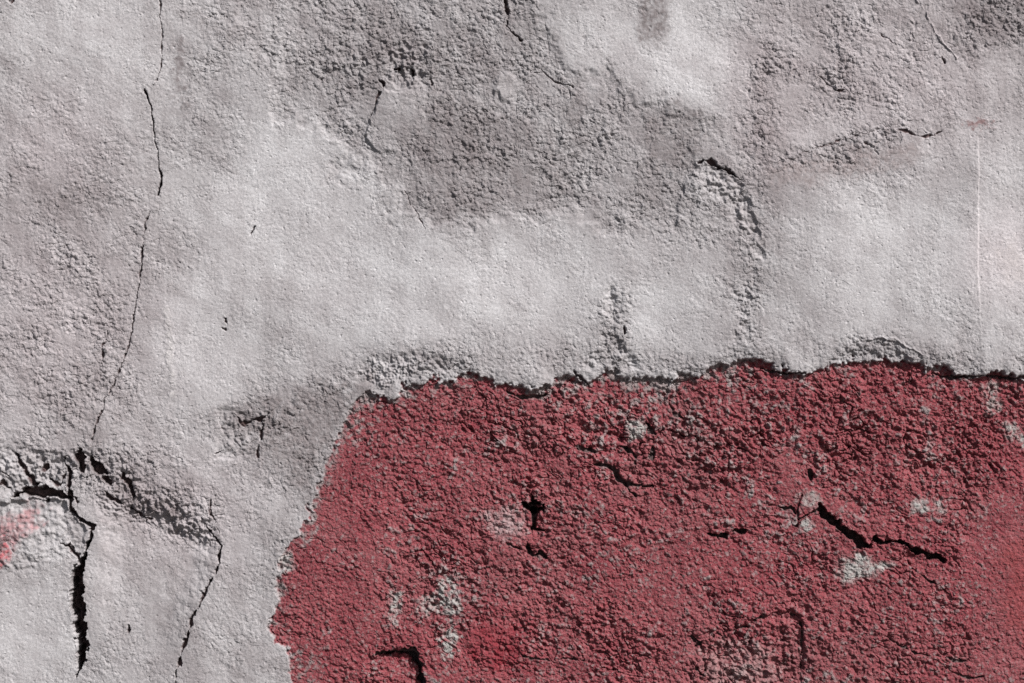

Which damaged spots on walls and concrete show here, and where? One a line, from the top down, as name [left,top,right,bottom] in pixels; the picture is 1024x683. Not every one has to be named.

crack [369,90,382,118]
crack [771,127,942,165]
crack [90,0,164,441]
spalling [352,349,486,399]
crack [59,456,97,679]
crack [174,499,223,683]
peeling [360,565,470,683]
peeling [478,502,534,551]
spalling [685,608,810,683]
peeling [791,488,825,535]
crack [767,493,950,596]
peeling [831,549,899,590]